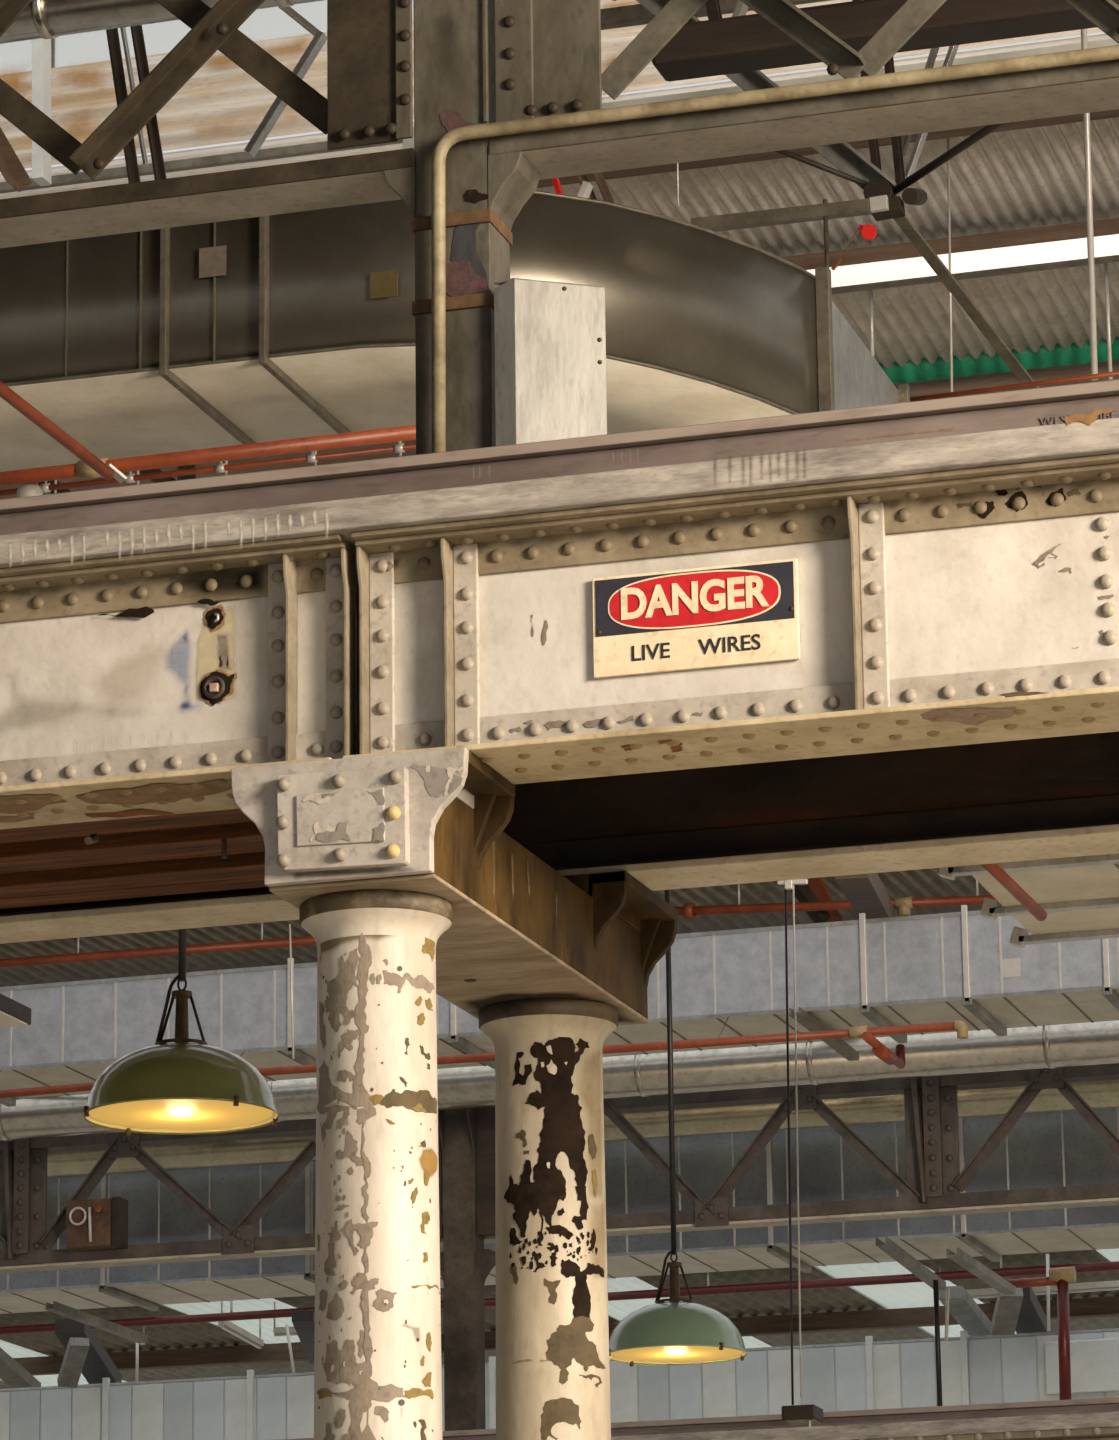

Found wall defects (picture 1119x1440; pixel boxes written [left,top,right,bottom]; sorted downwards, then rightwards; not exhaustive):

peeling [956,486,1081,519]
peeling [367,789,385,805]
peeling [411,764,464,798]
peeling [309,822,351,843]
peeling [372,822,385,842]
peeling [317,933,440,1440]
peeling [504,1037,605,1440]